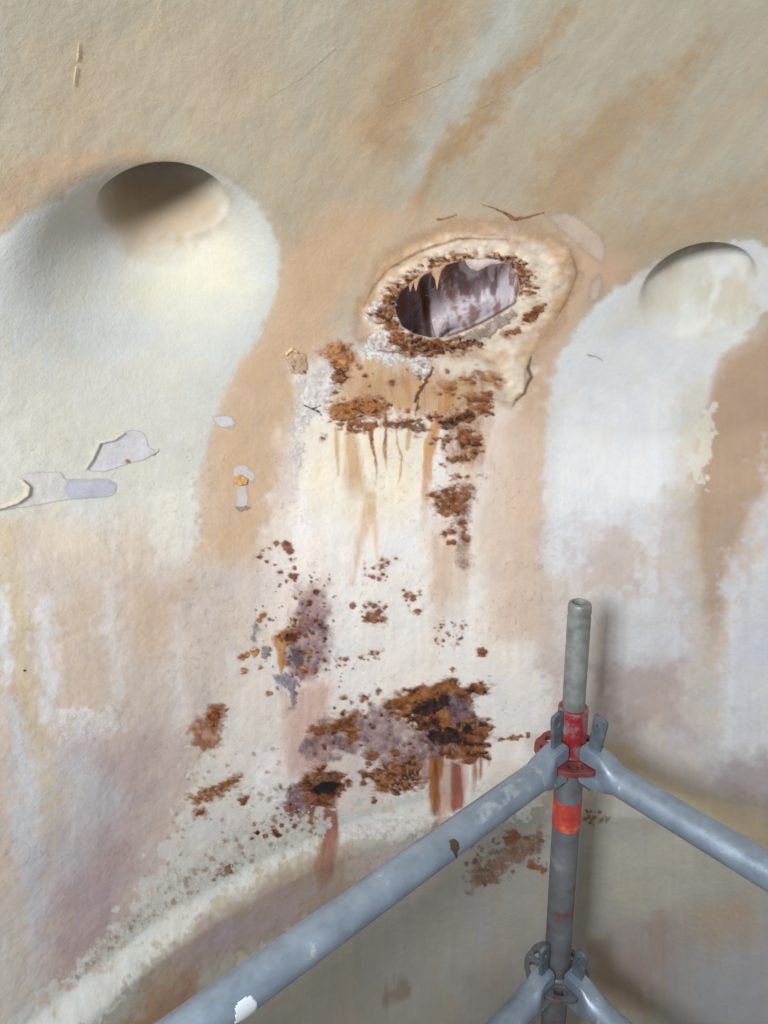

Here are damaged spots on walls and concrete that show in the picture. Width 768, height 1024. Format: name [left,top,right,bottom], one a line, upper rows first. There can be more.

crack [488,206,544,221]
peeling [465,258,504,271]
peeling [431,318,445,338]
peeling [213,415,236,428]
corrosion [318,341,403,473]
peeling [0,430,159,510]
peeling [233,465,255,512]
corrosion [426,370,502,569]
corrosion [256,540,334,639]
corrosion [190,704,228,751]
corrosion [300,641,530,823]
efflorescence [341,808,462,841]